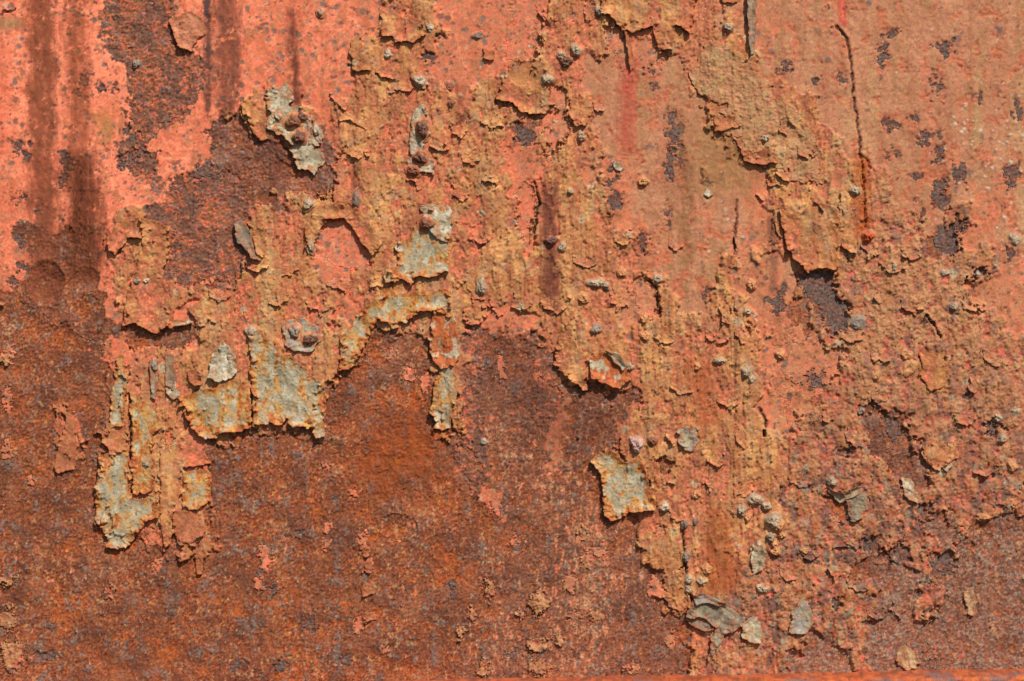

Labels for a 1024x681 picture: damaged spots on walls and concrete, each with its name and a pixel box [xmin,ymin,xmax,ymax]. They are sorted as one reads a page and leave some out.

rust [26,0,101,299]
rust [204,0,240,115]
peeling [684,0,823,201]
crack [835,26,870,223]
peeling [877,30,897,68]
peeling [881,115,968,254]
spalling [0,0,763,681]
peeling [764,192,925,434]
peeling [826,486,869,522]
spalling [871,393,958,525]
peeling [789,598,814,634]
spalling [896,523,1024,671]